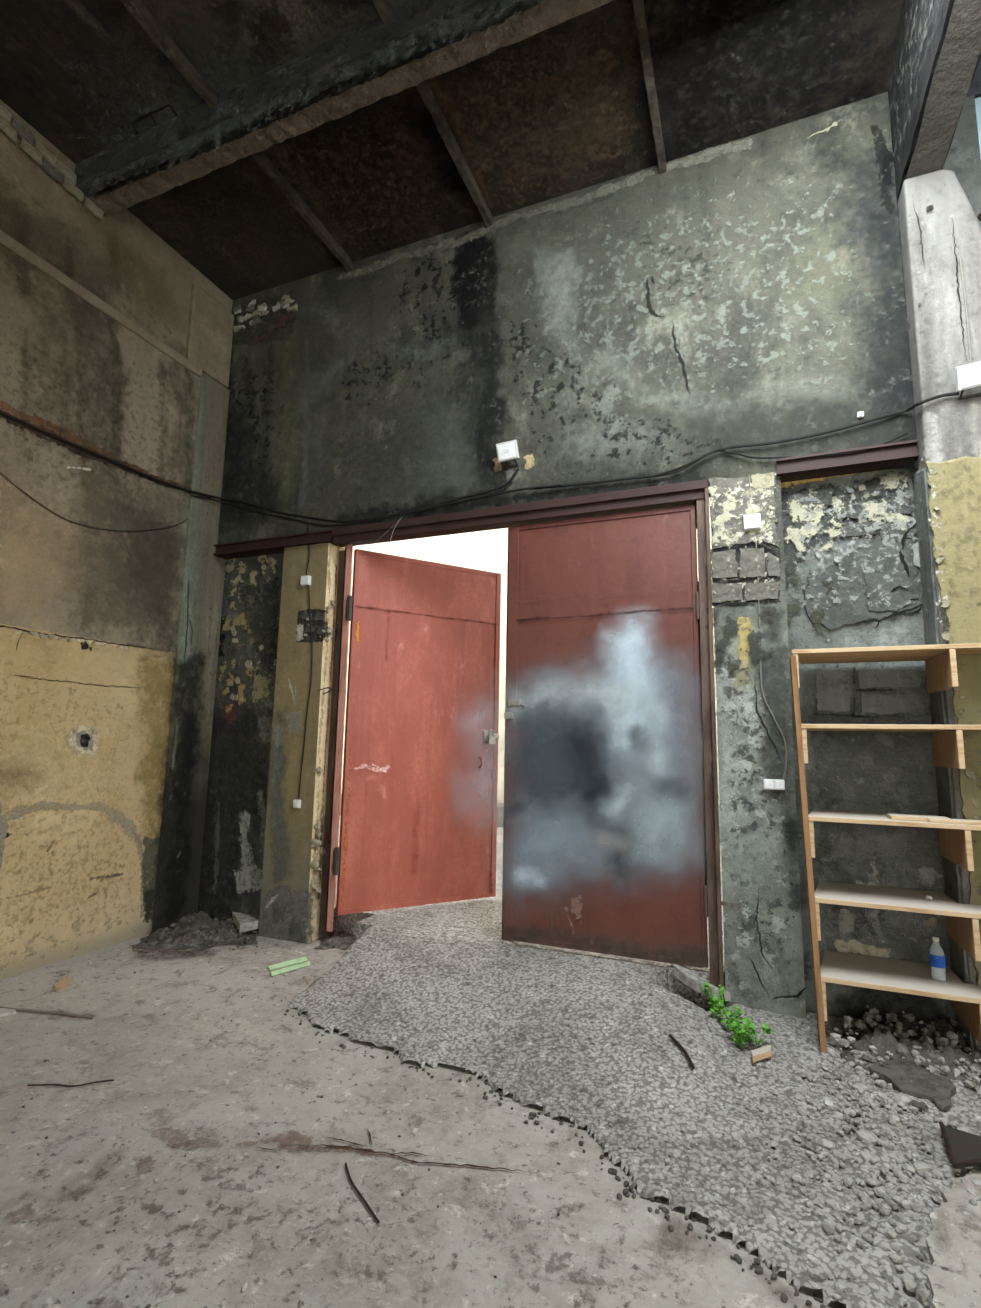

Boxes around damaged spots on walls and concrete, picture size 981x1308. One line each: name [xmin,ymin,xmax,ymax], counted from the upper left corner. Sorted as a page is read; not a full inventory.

flaking render [232,292,298,345]
water stain [220,0,943,527]
crack [646,276,690,394]
water stain [970,403,981,458]
water stain [0,201,290,926]
peeling [218,555,284,713]
flaking render [707,459,951,672]
crack [850,528,923,628]
crack [754,676,783,764]
crack [751,886,807,999]